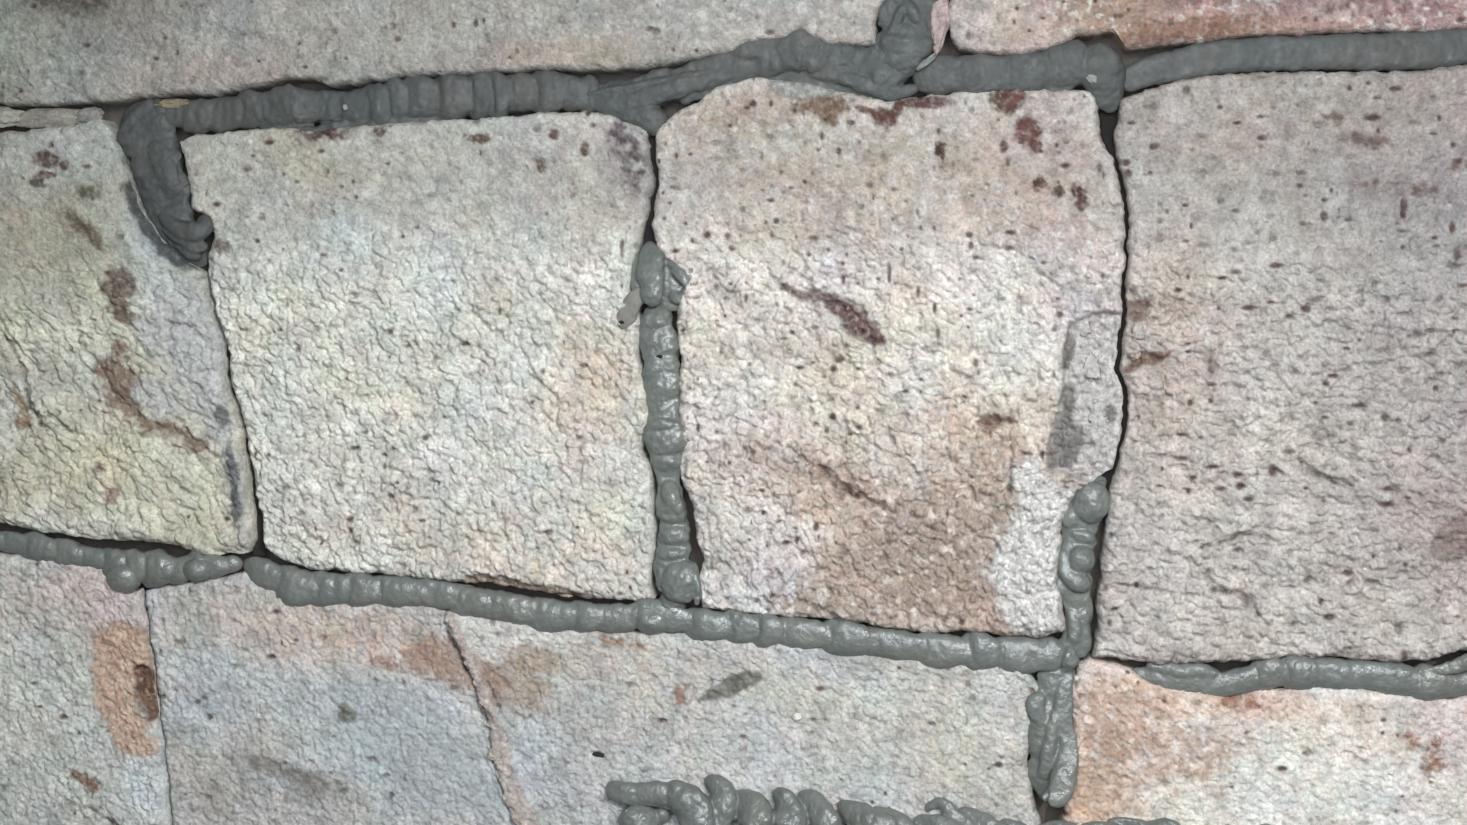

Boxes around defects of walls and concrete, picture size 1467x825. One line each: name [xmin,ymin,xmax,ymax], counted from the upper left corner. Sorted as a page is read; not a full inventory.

crack [445,611,537,825]